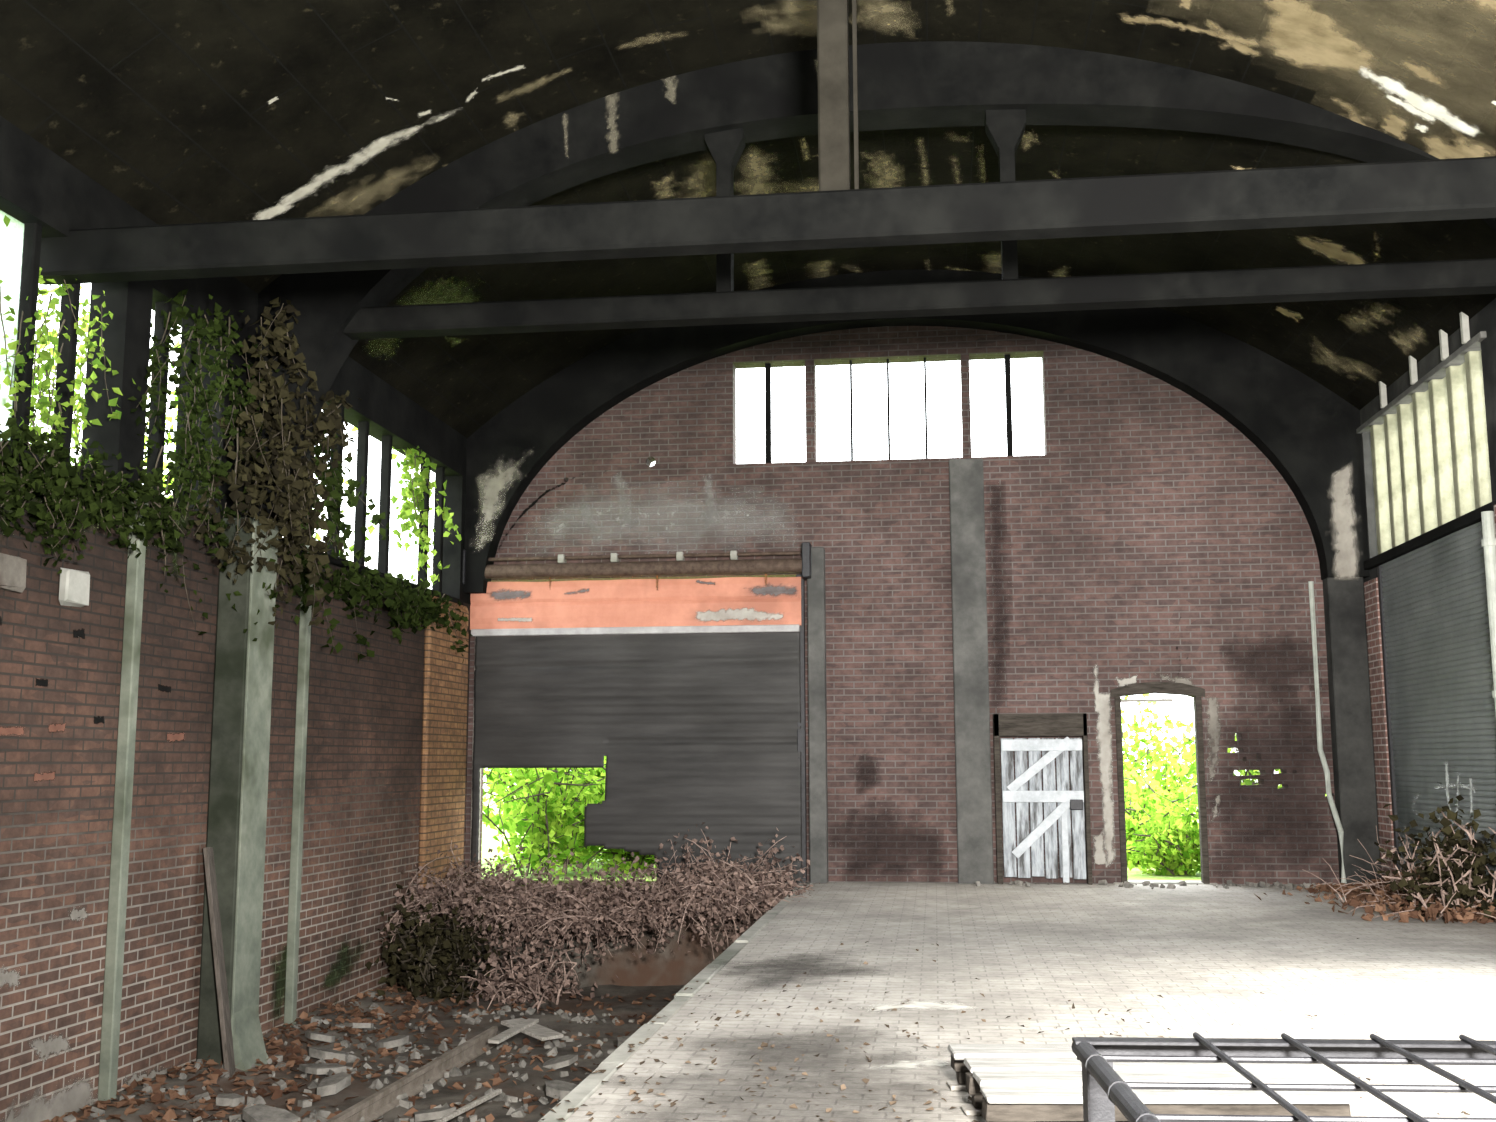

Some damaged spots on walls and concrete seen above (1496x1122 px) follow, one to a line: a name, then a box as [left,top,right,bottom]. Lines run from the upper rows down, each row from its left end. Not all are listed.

peeling [862,0,909,29]
peeling [620,33,682,48]
peeling [498,69,571,127]
spalling [664,76,676,102]
peeling [1122,0,1496,159]
spalling [606,94,619,153]
peeling [321,165,430,211]
peeling [652,159,716,198]
peeling [740,150,819,195]
peeling [868,156,899,188]
peeling [697,608,783,622]
water stain [1226,642,1317,854]